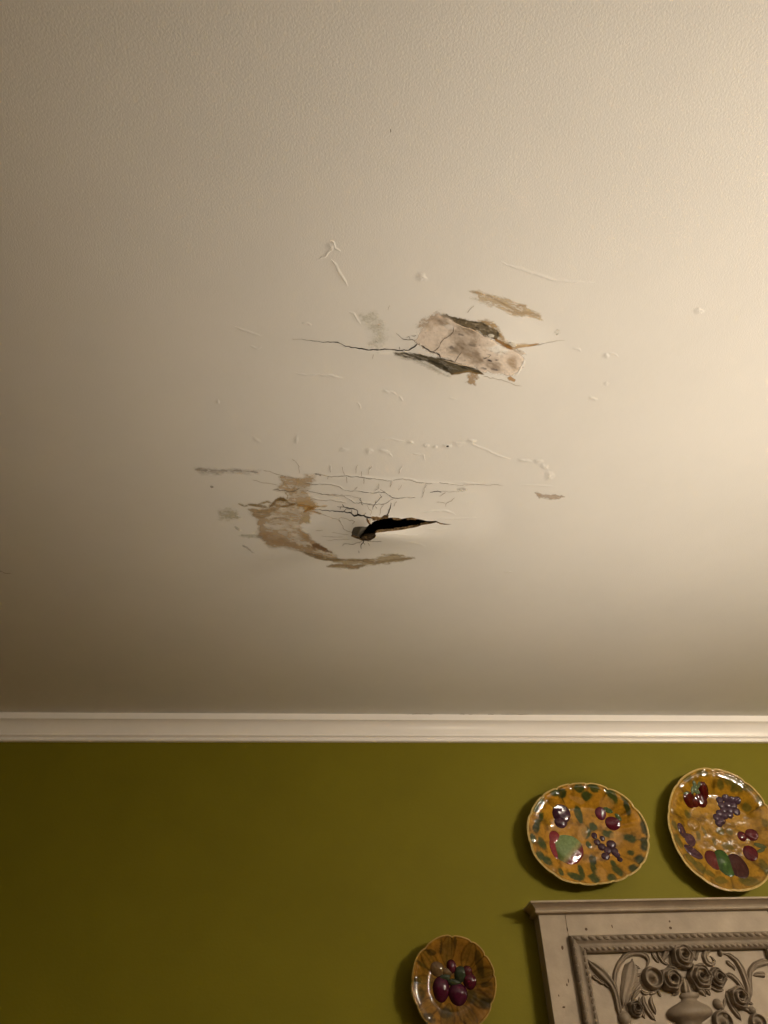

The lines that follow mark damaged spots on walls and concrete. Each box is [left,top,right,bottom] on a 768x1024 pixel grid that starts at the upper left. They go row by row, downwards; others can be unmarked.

crack [303,339,417,359]
spalling [395,314,537,376]
leakage [221,476,412,569]
crack [210,459,501,549]